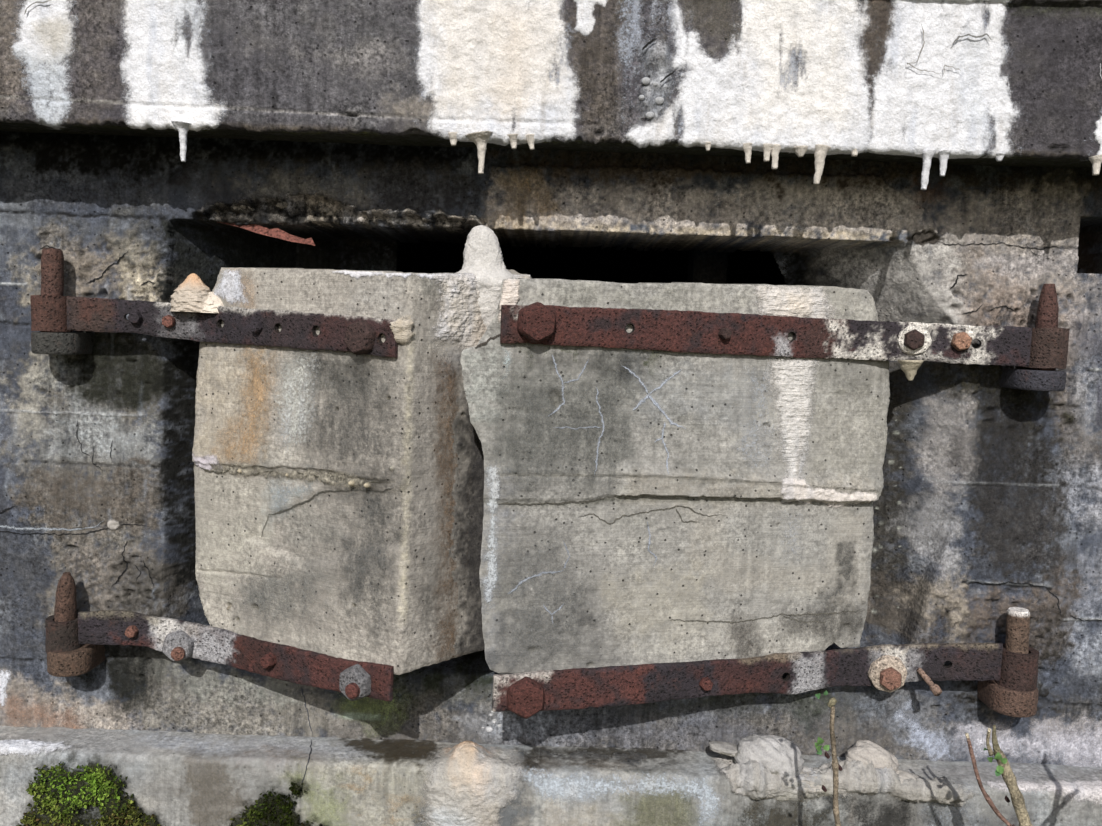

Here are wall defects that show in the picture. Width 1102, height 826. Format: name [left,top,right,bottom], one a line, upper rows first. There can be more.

water stain [12,0,74,130]
water stain [120,0,226,162]
water stain [416,0,580,174]
water stain [616,0,642,65]
water stain [626,0,1019,190]
water stain [1088,117,1102,175]
spalling [200,193,482,235]
crack [501,356,722,567]
crack [193,463,394,537]
crack [510,540,570,593]
water stain [516,746,684,776]
water stain [497,789,534,826]